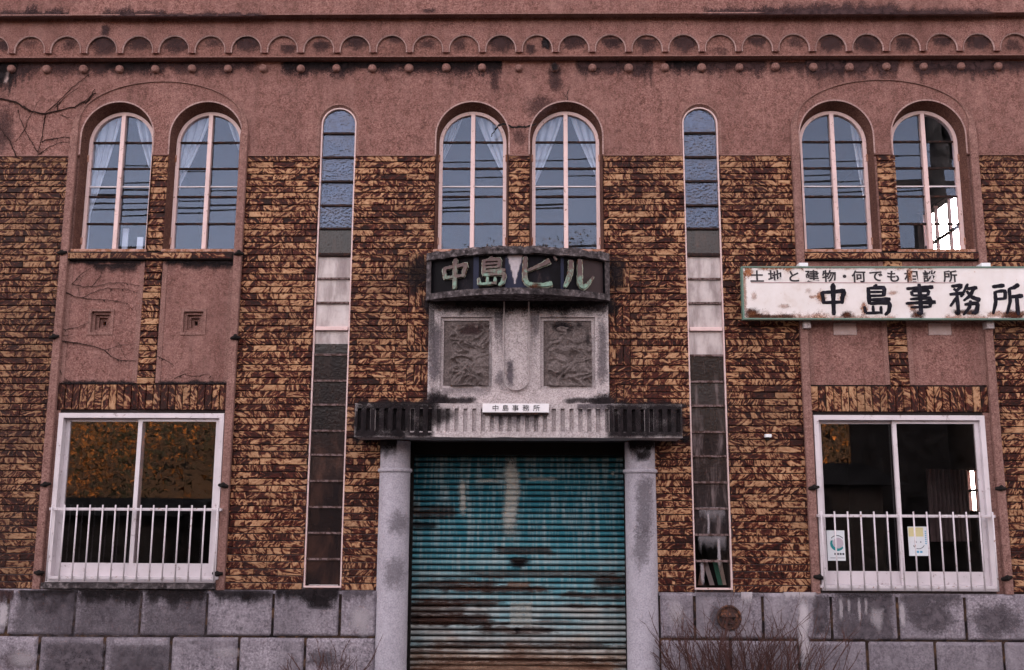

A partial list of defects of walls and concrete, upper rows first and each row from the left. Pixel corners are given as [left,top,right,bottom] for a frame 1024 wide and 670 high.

water stain [549,66,562,91]
corrosion [743,268,827,320]
corrosion [946,310,1024,318]
corrosion [496,546,552,554]
corrosion [562,576,625,608]
corrosion [410,580,617,670]